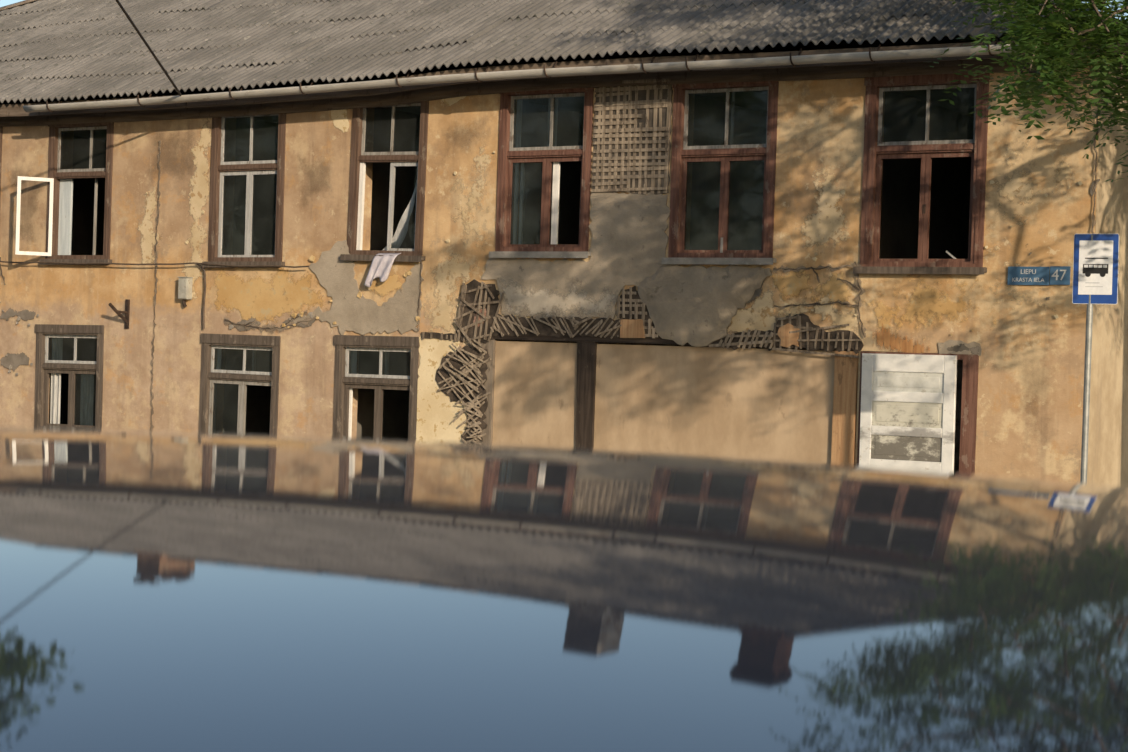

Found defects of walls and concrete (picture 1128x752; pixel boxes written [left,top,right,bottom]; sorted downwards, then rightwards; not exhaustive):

spalling [182,78,673,444]